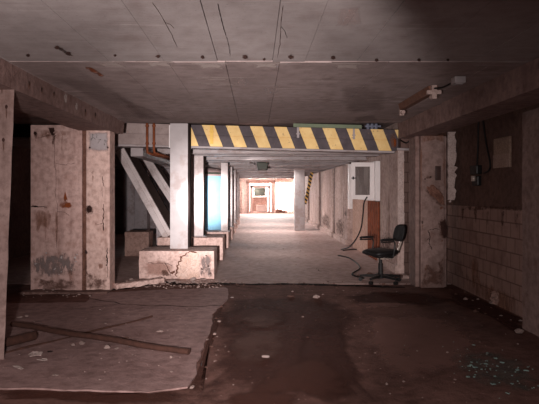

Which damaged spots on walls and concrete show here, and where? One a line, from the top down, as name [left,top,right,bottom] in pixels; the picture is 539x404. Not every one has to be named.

peeling [426,132,458,210]
crack [76,262,405,309]